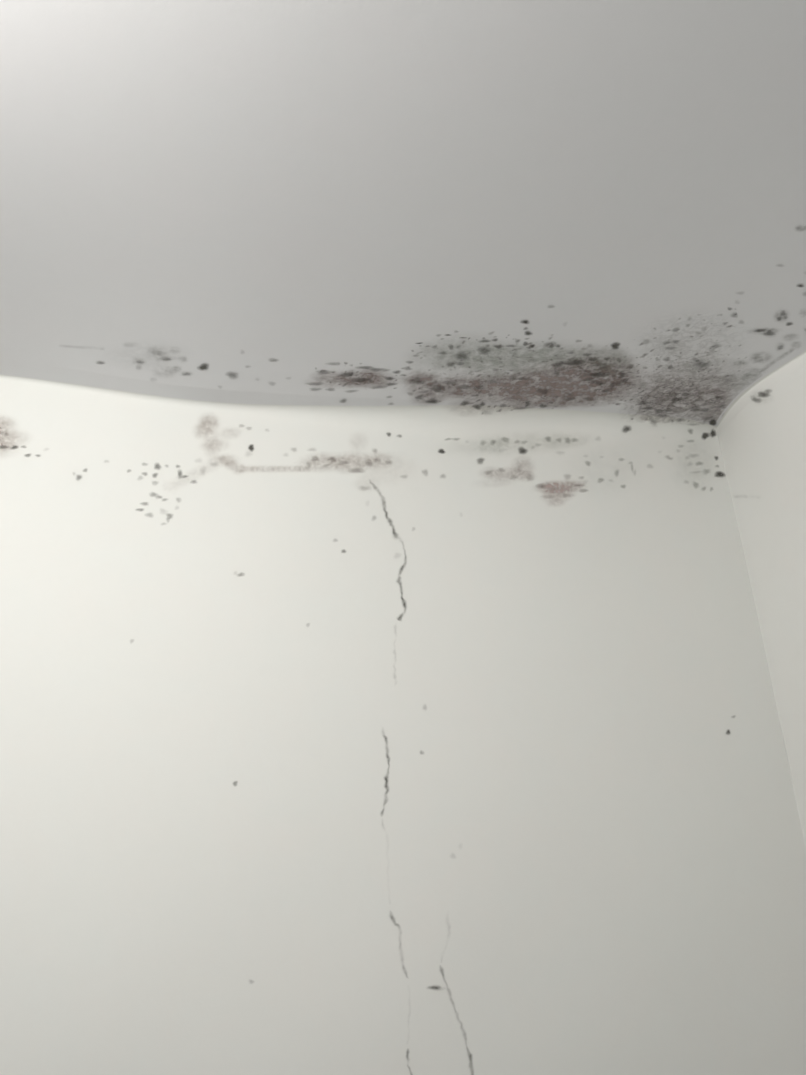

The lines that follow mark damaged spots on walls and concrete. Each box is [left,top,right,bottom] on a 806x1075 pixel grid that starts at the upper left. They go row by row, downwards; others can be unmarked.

leakage [340,367,399,385]
leakage [409,321,631,409]